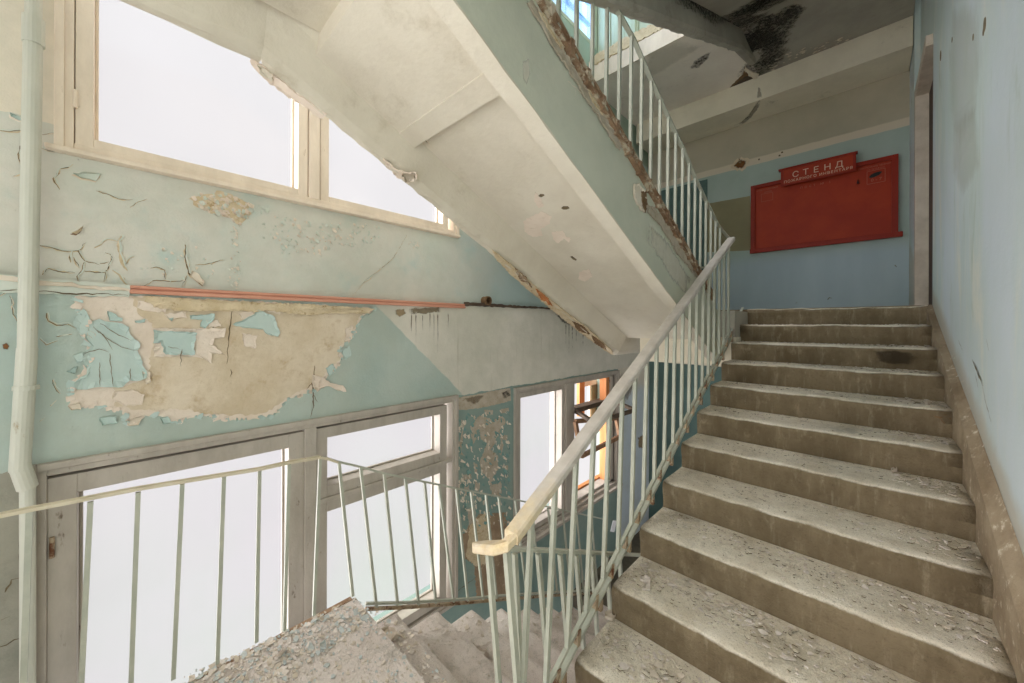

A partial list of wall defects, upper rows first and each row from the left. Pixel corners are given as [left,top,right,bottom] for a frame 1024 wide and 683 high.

spalling [527,0,621,151]
mould [679,0,805,76]
crack [98,190,147,208]
spalling [383,158,418,184]
spalling [633,183,698,278]
peeling [39,280,377,426]
spalling [492,249,613,355]
peeling [458,388,511,600]